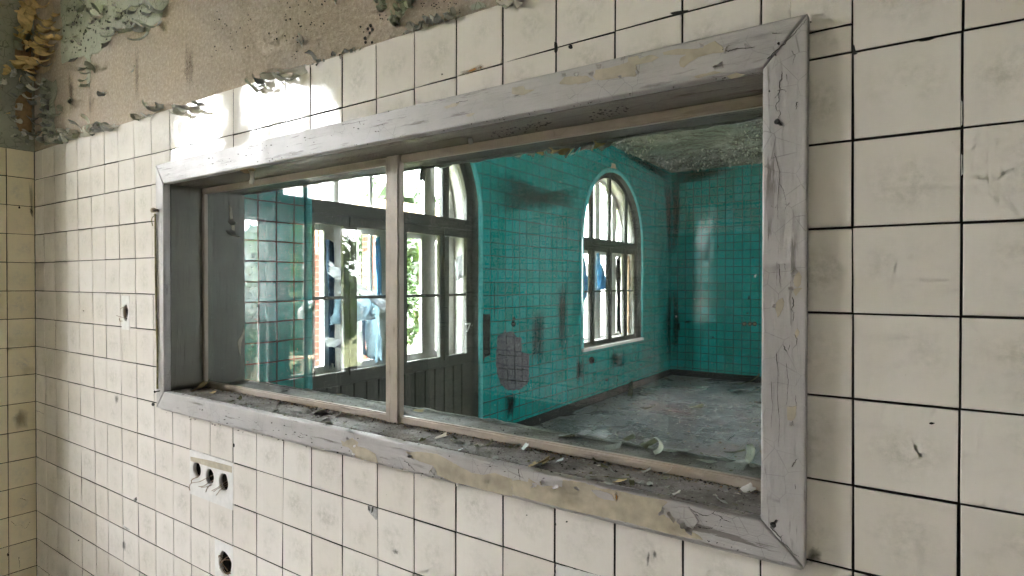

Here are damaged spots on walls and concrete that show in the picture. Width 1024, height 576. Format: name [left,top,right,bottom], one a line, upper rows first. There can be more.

peeling [0,0,169,145]
peeling [130,99,200,121]
peeling [245,0,524,92]
peeling [515,120,763,173]
peeling [559,41,753,85]
crack [722,18,808,115]
peeling [482,314,529,391]
peeling [271,422,718,543]
peeling [623,434,756,470]